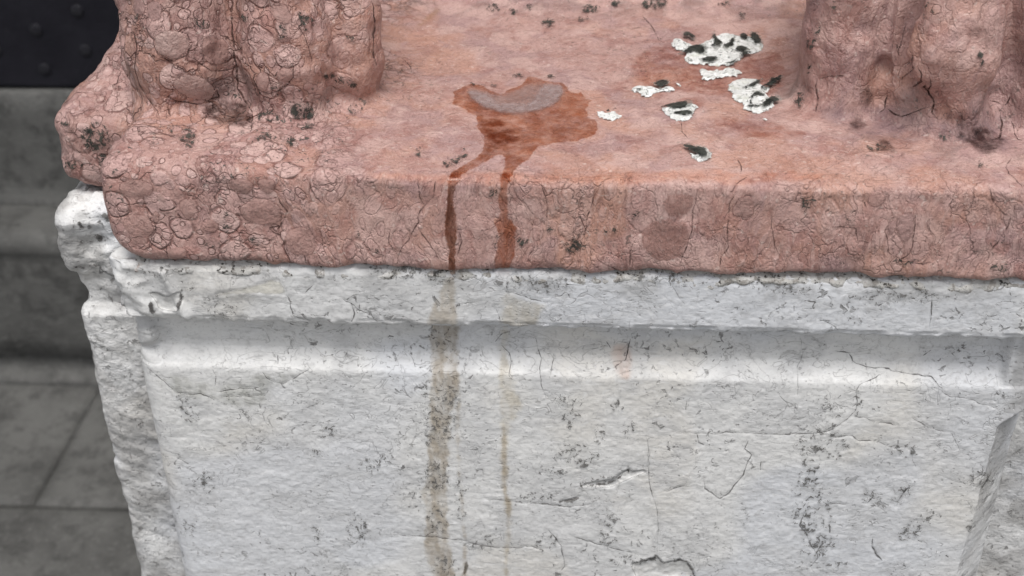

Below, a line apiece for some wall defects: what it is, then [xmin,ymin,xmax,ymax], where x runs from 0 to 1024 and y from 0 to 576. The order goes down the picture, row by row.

crack [650,350,980,514]